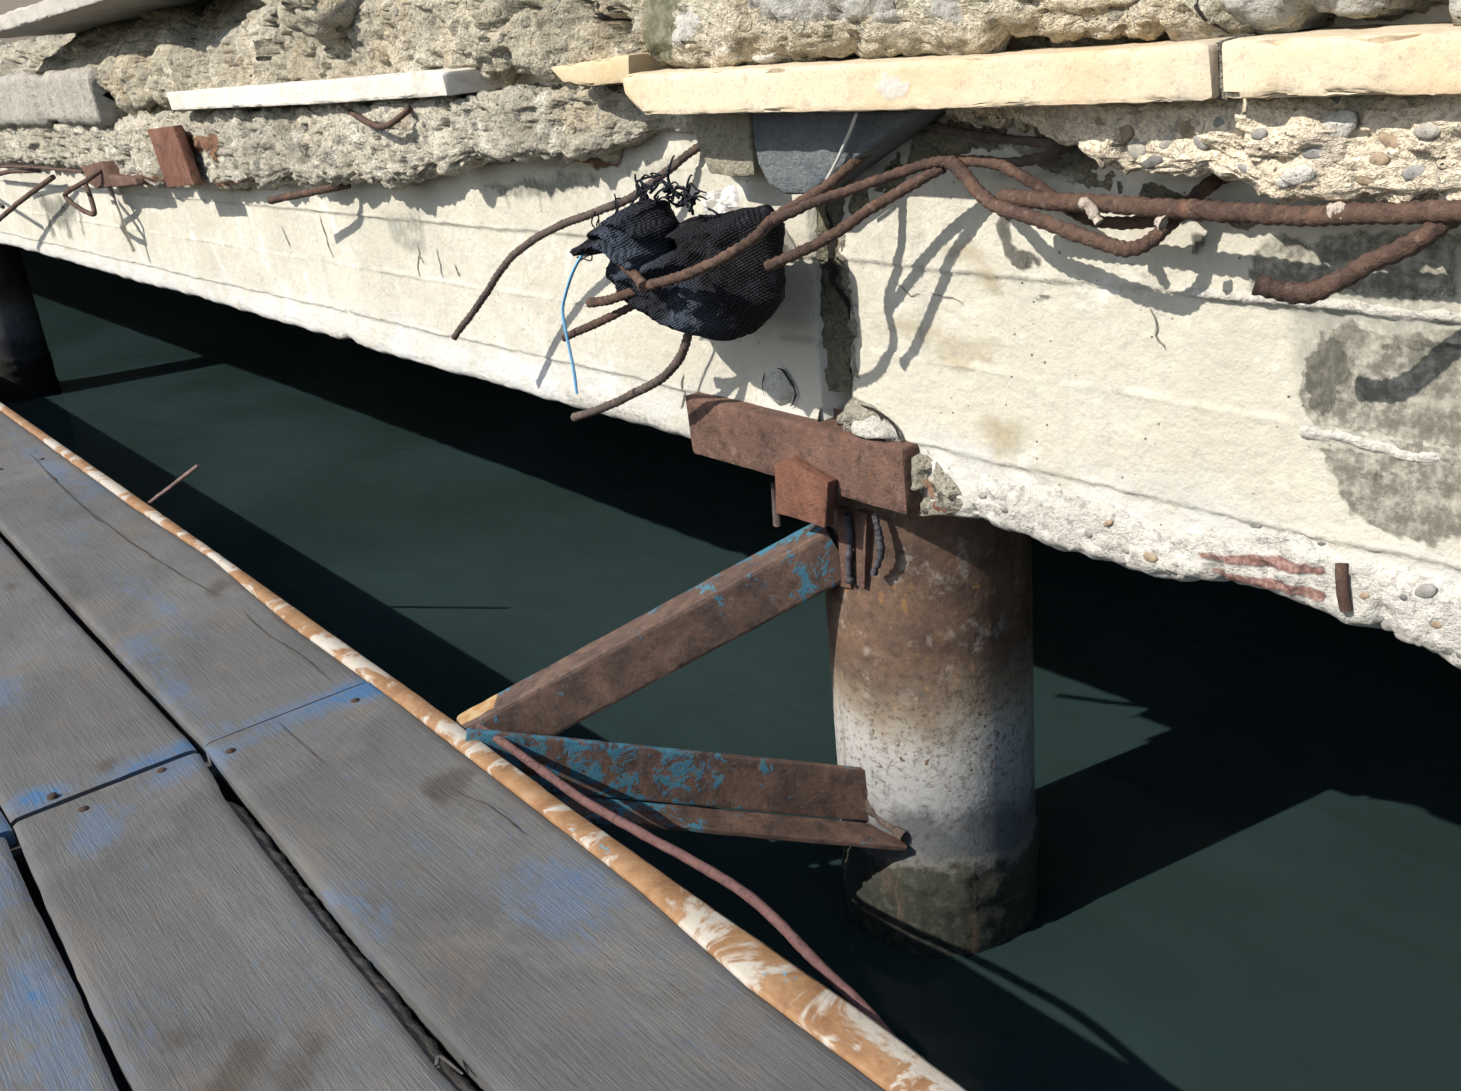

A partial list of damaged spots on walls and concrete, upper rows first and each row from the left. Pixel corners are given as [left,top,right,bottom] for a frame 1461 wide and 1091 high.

peeling [672,6,700,48]
crack [1194,0,1229,34]
rust [187,134,255,187]
spalling [0,82,695,193]
rust [573,159,618,170]
crack [822,203,851,321]
spalling [836,95,1461,379]
leakage [1249,201,1400,283]
crack [848,357,903,443]
leakage [1299,234,1461,547]
spalling [910,450,1461,669]
rust [1198,552,1325,602]